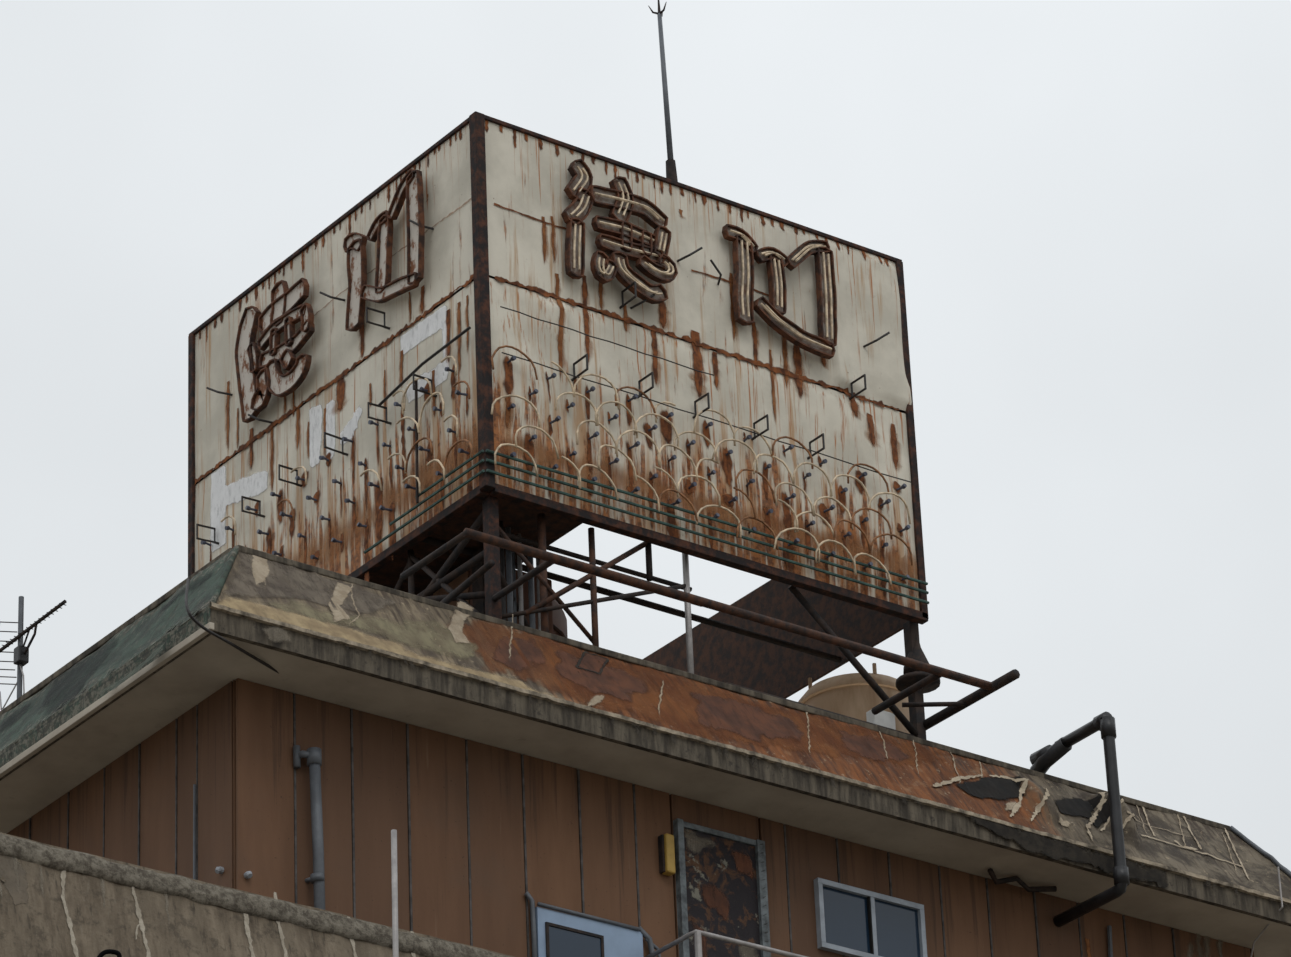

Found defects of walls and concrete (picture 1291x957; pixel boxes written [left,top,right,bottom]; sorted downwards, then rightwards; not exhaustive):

spalling [956,776,1024,800]
spalling [1054,794,1121,828]